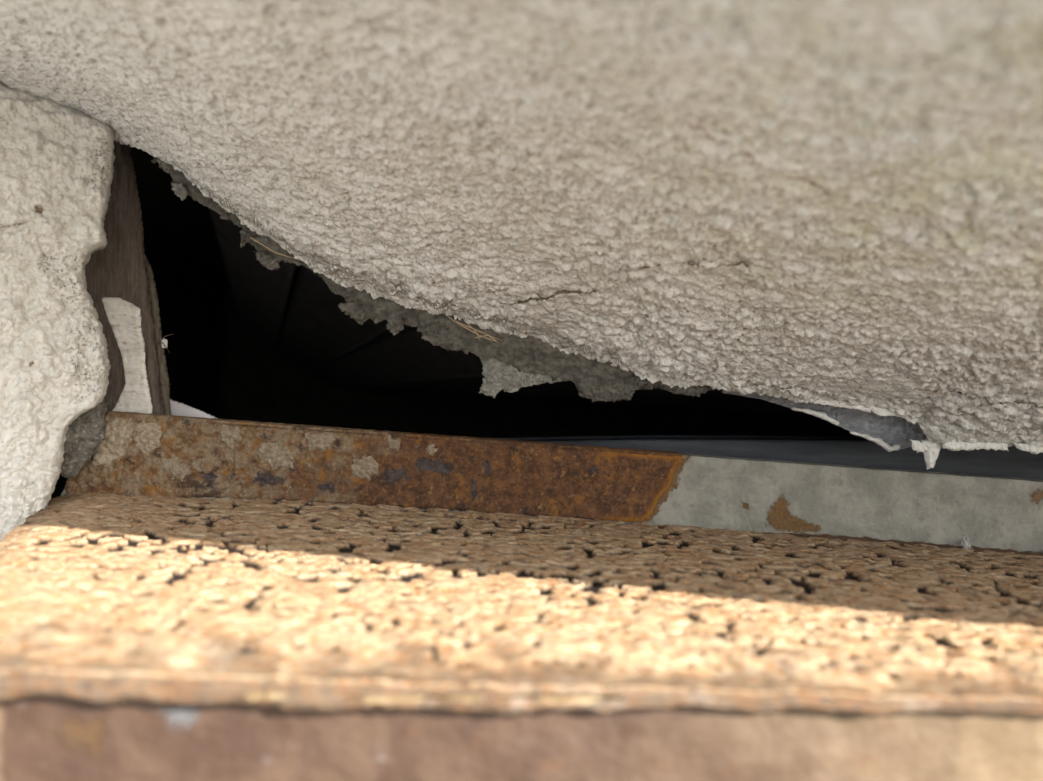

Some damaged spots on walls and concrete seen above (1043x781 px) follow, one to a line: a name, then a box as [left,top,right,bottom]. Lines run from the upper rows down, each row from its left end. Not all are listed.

spalling [151,157,1043,470]
rust [64,411,690,523]
rust [767,495,821,534]